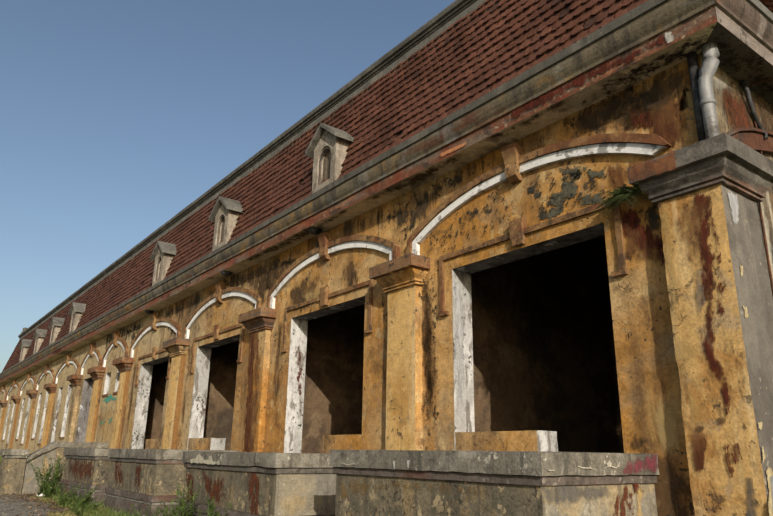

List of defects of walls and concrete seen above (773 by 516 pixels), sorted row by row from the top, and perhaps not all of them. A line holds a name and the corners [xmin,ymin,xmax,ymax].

leakage [564,26,773,136]
spalling [527,166,604,220]
corrosion [621,208,664,265]
corrosion [678,193,731,415]
leakage [425,274,439,419]
corrosion [247,472,259,515]
corrosion [611,483,643,516]
corrosion [692,433,707,473]
corrosion [723,442,742,478]
peeling [762,447,773,516]